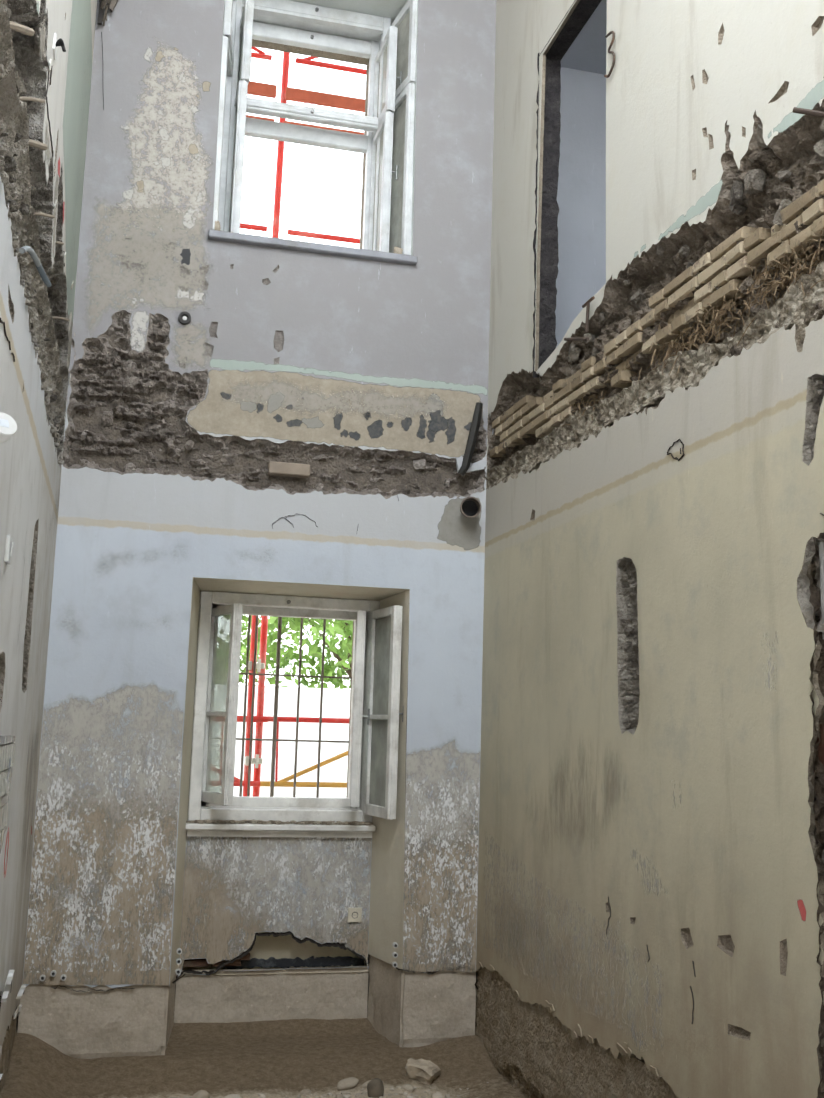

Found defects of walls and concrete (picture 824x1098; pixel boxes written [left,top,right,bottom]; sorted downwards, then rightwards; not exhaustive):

flaking render [811,16,824,36]
flaking render [690,69,709,90]
flaking render [768,81,789,104]
flaking render [702,127,714,150]
peeling [88,42,211,352]
peeling [53,178,67,263]
spalling [486,261,824,489]
peeling [175,322,480,457]
crack [172,931,370,984]
crack [52,984,135,992]
crack [396,966,478,990]
flaking render [728,1024,751,1041]